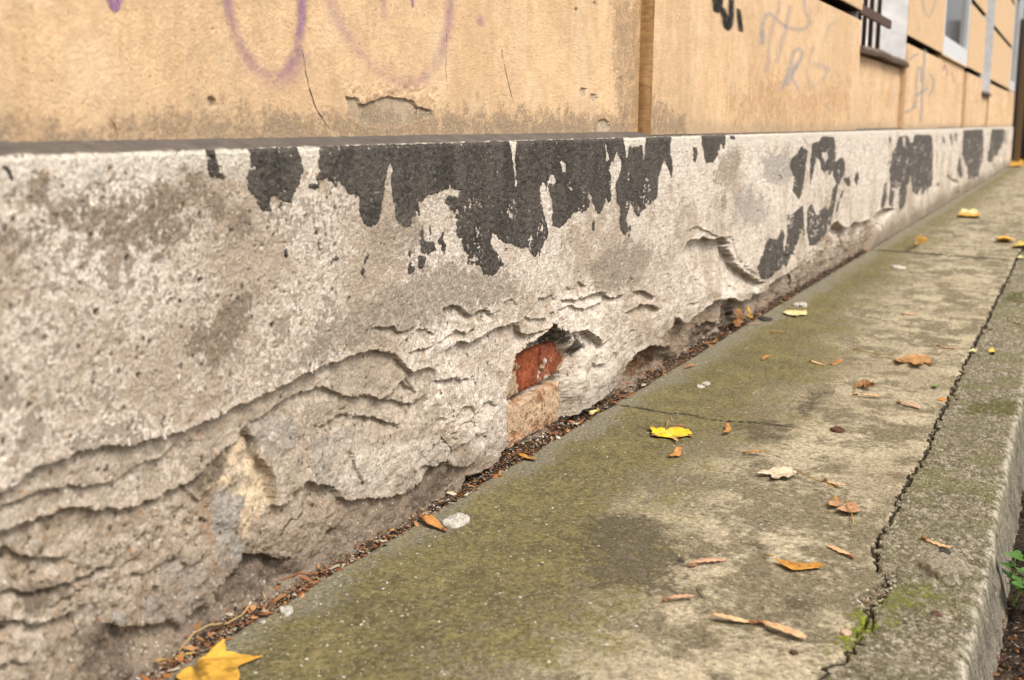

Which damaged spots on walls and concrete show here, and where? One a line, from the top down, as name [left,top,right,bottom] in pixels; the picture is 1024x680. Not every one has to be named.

flaking render [345,95,432,127]
flaking render [0,129,1006,680]
crack [613,404,792,427]
crack [817,222,1024,680]